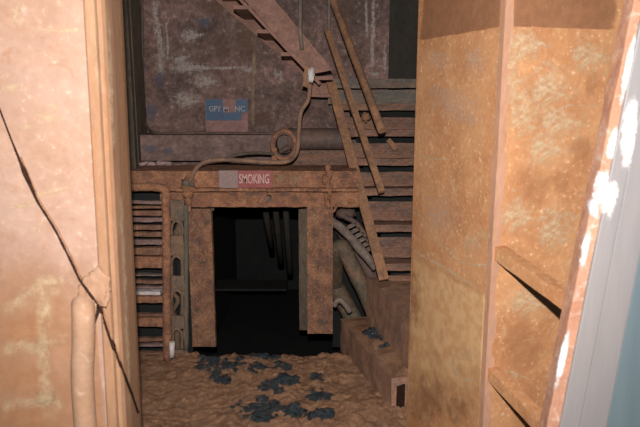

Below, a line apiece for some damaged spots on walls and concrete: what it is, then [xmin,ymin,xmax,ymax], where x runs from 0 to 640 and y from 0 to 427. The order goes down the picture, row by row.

peeling [620,36,635,100]
peeling [607,102,637,166]
rust [539,0,640,427]
peeling [587,172,618,217]
peeling [580,235,590,265]
peeling [556,334,568,377]